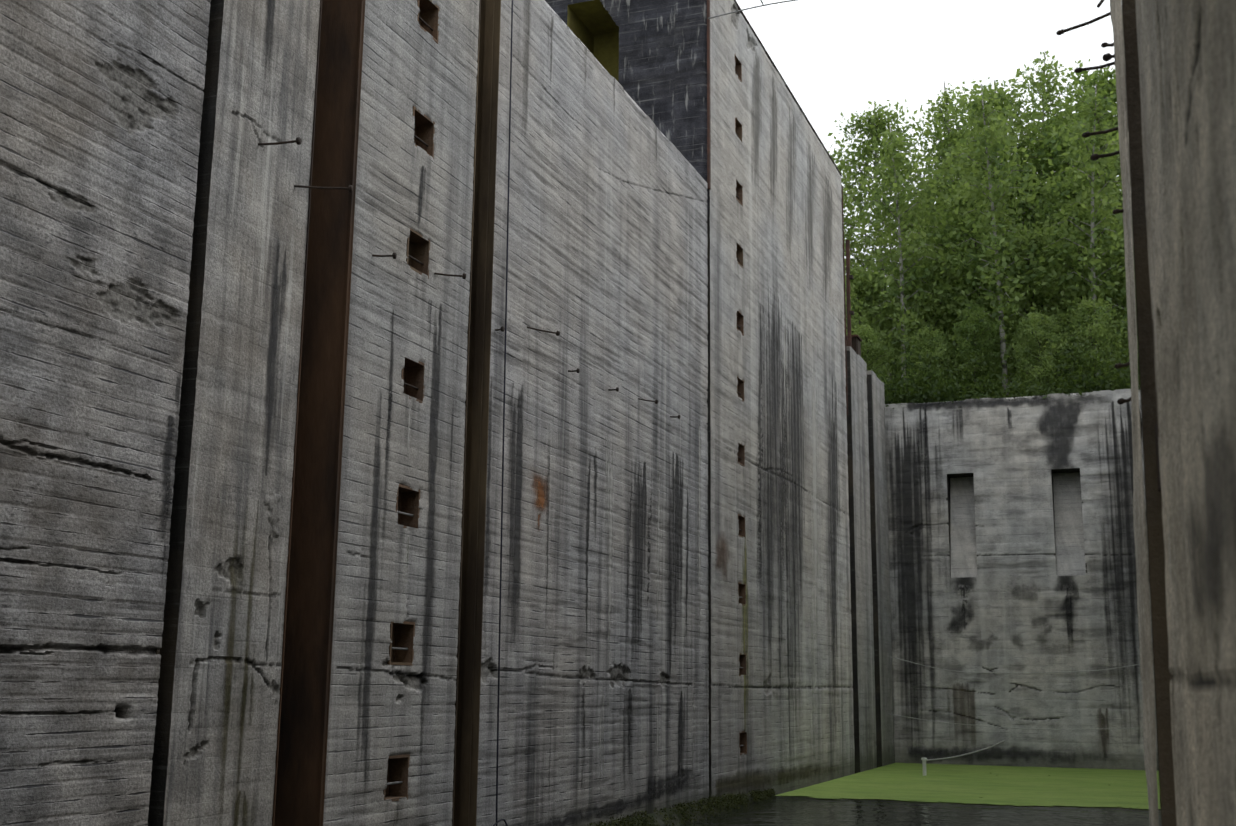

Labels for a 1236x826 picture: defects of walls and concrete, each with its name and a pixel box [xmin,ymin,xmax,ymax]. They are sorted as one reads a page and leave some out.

crack [0,161,69,196]
crack [0,435,155,482]
leakage [508,383,523,635]
rust [534,477,548,528]
leakage [887,397,1092,730]
crack [198,591,281,692]
crack [918,667,1119,723]
leakage [909,746,1085,762]